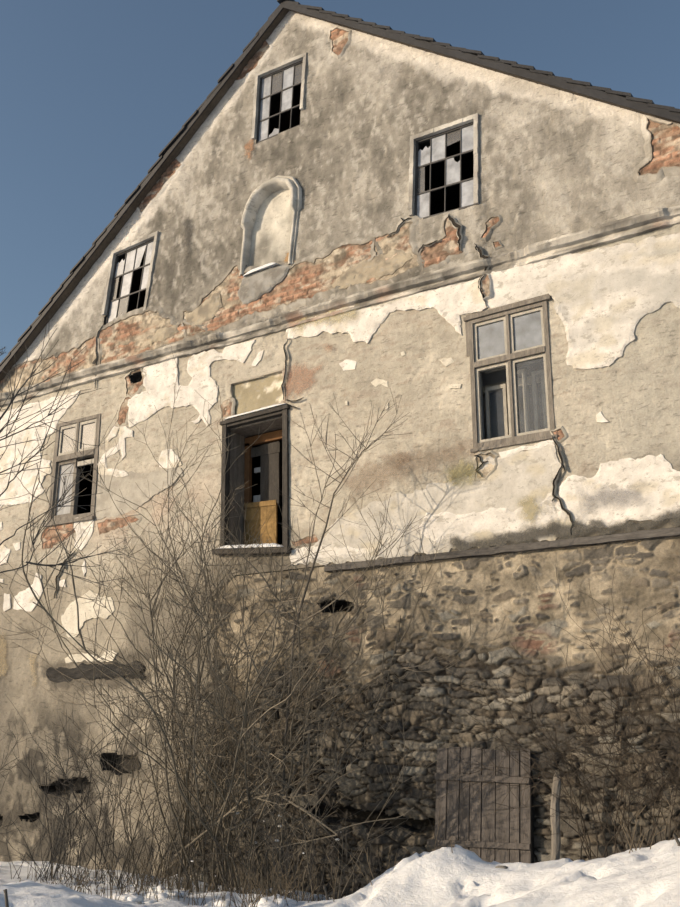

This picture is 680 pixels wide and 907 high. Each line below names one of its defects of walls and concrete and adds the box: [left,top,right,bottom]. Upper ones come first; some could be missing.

flaking render [136,156,185,218]
flaking render [632,114,680,183]
flaking render [0,213,468,393]
crack [418,215,490,307]
peeling [286,233,680,369]
peeling [0,573,43,612]
peeling [0,390,80,509]
peeling [61,590,115,638]
flaking render [39,513,142,577]
peeling [98,339,264,477]
peeling [290,426,680,566]
crack [552,436,574,535]